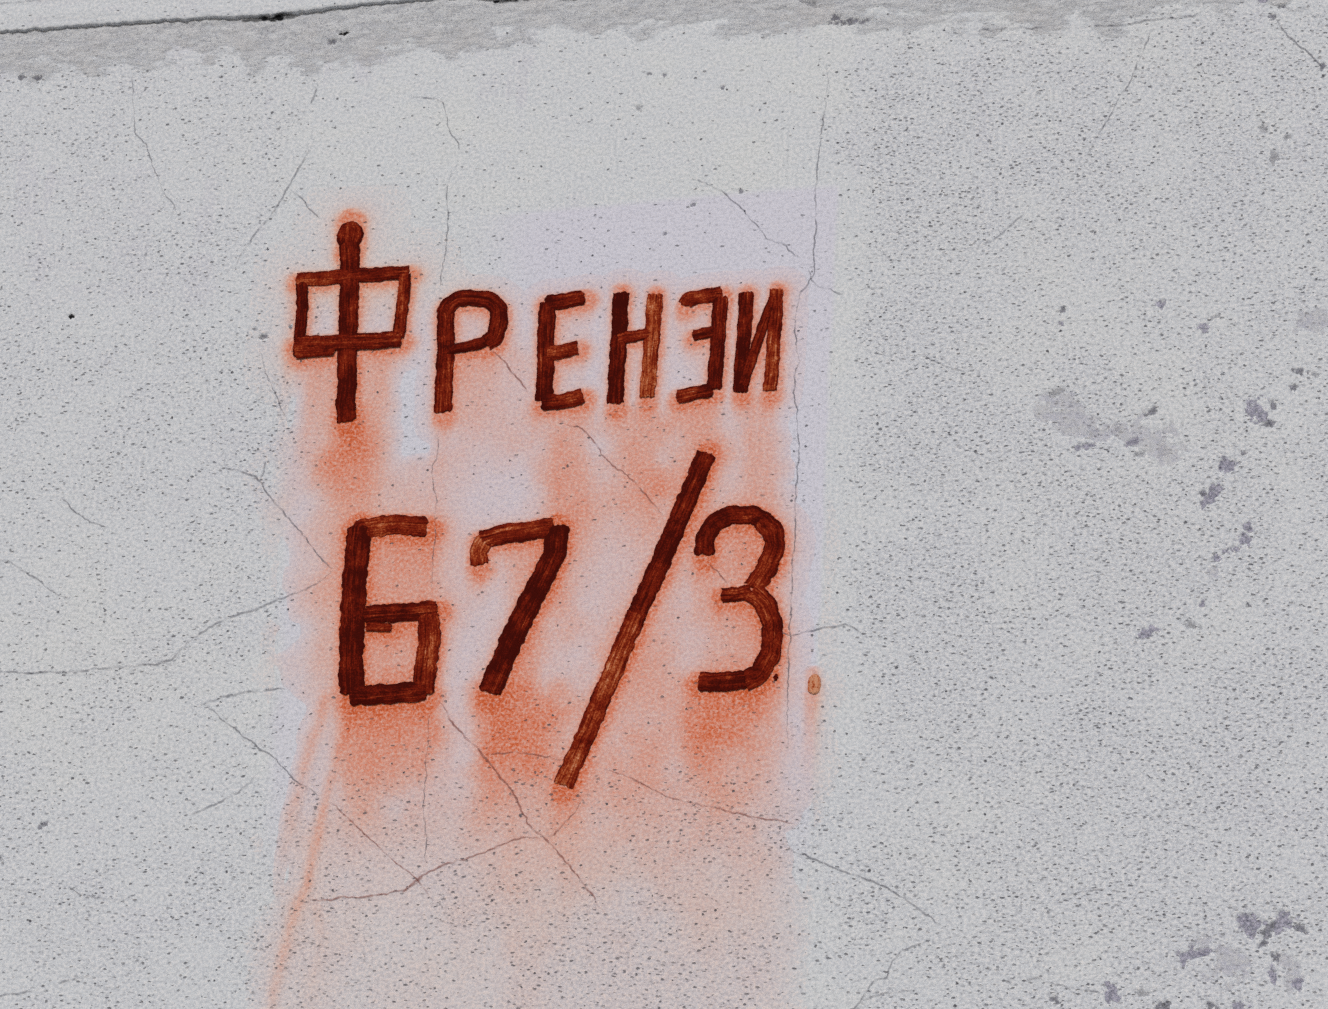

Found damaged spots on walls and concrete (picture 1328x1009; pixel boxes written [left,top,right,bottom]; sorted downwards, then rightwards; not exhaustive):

spalling [0,0,1240,82]
spalling [1259,0,1290,20]